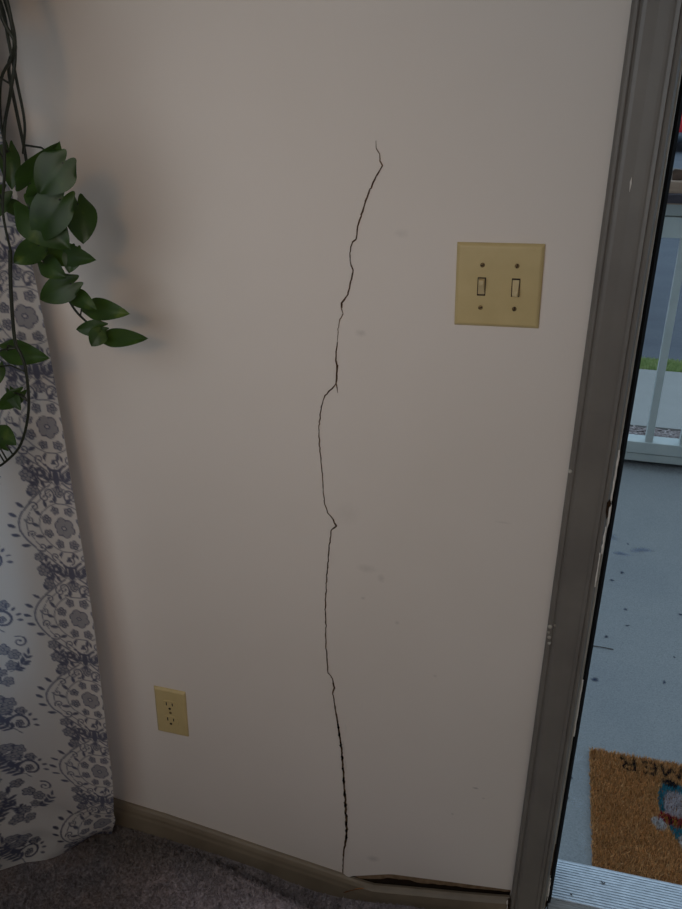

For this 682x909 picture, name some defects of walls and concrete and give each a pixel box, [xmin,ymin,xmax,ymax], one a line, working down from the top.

crack [318,148,383,893]